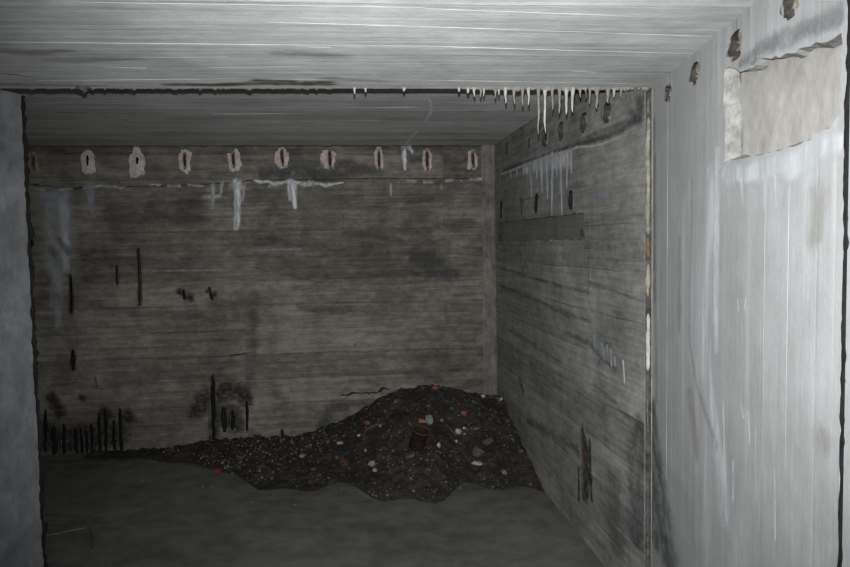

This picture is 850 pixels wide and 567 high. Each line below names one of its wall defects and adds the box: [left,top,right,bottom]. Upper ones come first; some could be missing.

hole [783,0,795,21]
leakage [462,87,650,124]
spalling [690,61,698,86]
spalling [723,29,843,161]
efflorescence [234,179,244,227]
leakage [254,166,344,209]
leakage [501,129,622,216]
crack [340,387,389,399]
rust [578,425,593,501]